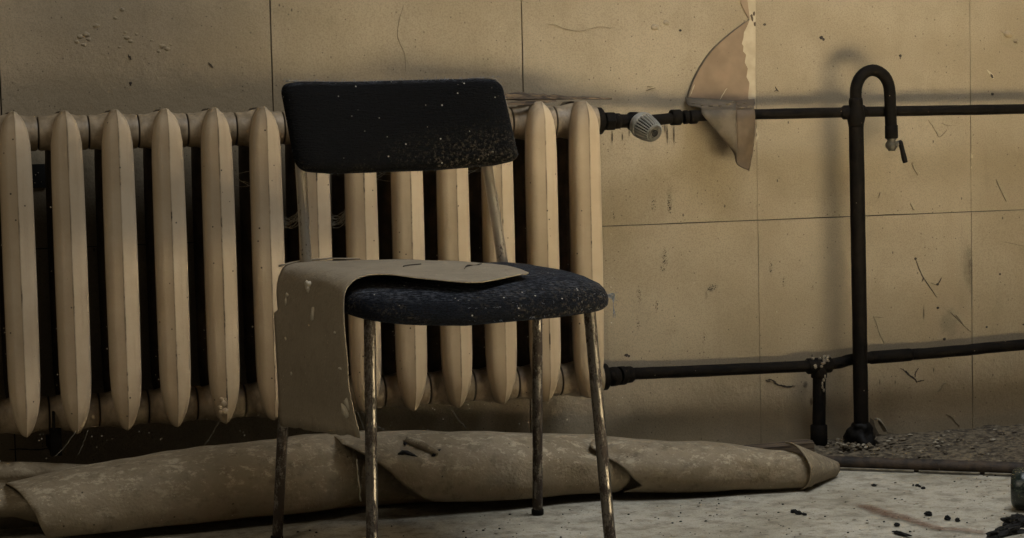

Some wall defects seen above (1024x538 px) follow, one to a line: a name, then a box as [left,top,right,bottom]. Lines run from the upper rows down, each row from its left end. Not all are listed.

flaking render [742,0,756,109]